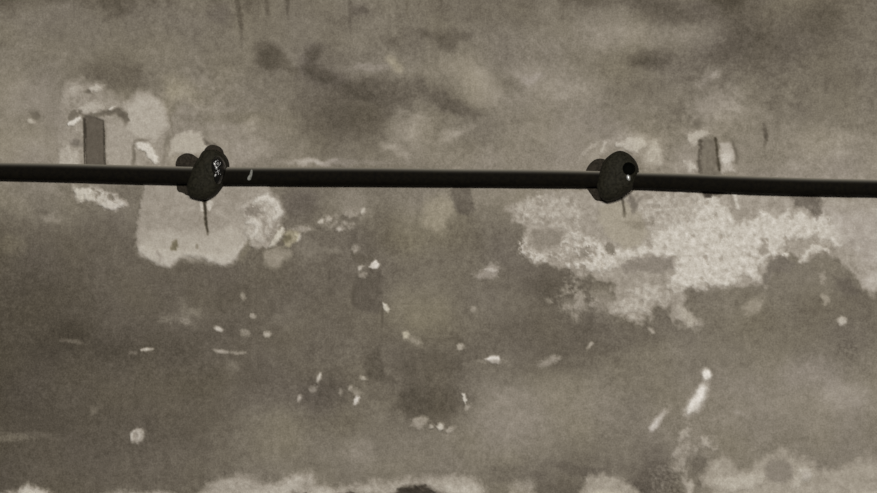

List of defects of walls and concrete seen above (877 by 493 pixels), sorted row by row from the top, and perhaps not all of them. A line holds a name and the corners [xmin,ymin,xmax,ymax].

damp [0,0,176,42]
damp [205,0,490,123]
damp [552,0,650,16]
peeling [52,73,277,167]
peeling [58,181,367,273]
damp [501,187,877,335]
damp [576,366,877,493]
damp [0,480,55,493]
damp [196,466,490,493]
damp [506,475,542,493]